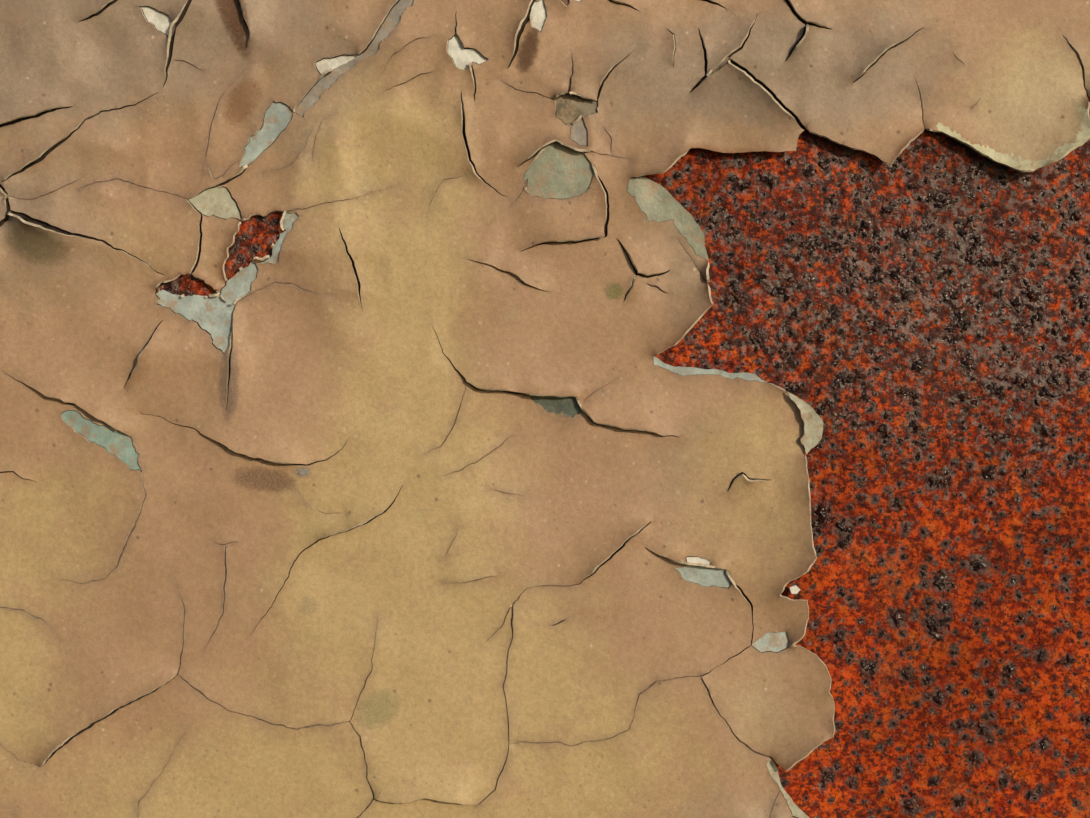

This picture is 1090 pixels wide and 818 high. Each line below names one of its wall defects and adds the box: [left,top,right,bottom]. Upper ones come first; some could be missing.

rust [150,205,287,314]
peeling [156,213,299,354]
crack [0,0,984,484]
peeling [524,95,598,199]
peeling [627,108,924,267]
peeling [937,98,1090,172]
peeling [62,410,142,471]
crack [0,307,774,818]
peeling [647,282,835,818]
crack [714,459,785,504]
rust [632,128,1090,818]
crack [764,788,782,818]